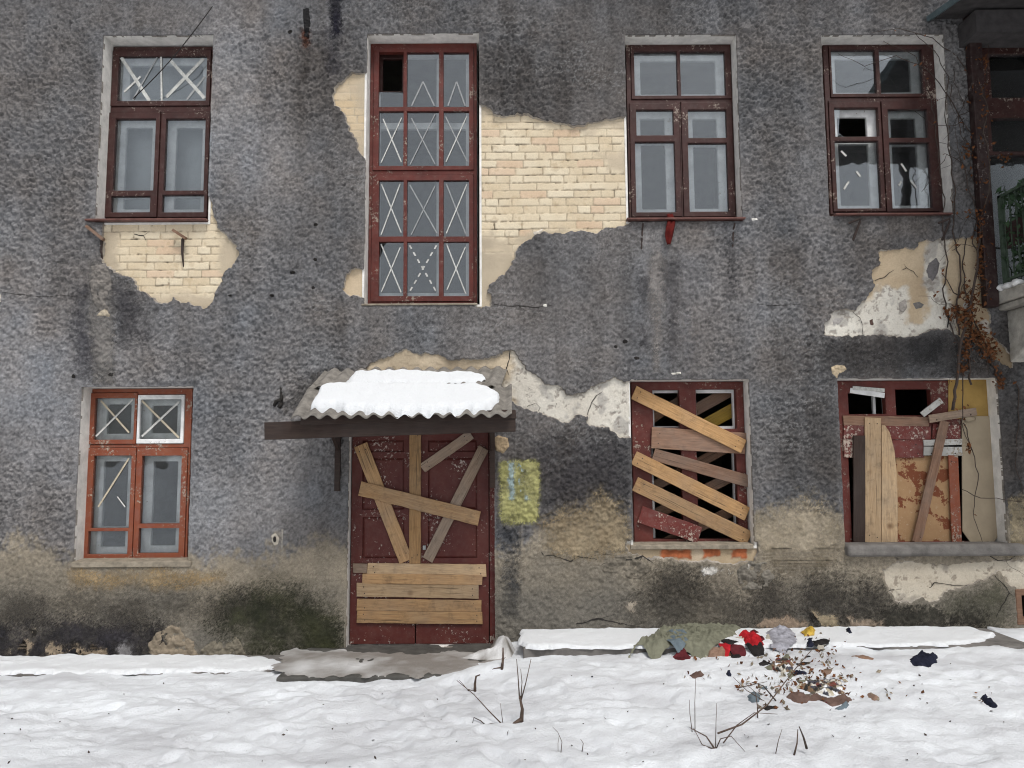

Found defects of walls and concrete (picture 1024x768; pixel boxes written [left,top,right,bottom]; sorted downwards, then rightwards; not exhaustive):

flaking render [332,72,366,157]
flaking render [480,105,629,308]
flaking render [101,200,239,309]
flaking render [342,268,363,298]
spalling [824,236,1013,368]
spalling [365,349,630,438]
leakage [0,591,223,656]
leakage [627,564,990,629]
spalling [882,560,1024,608]